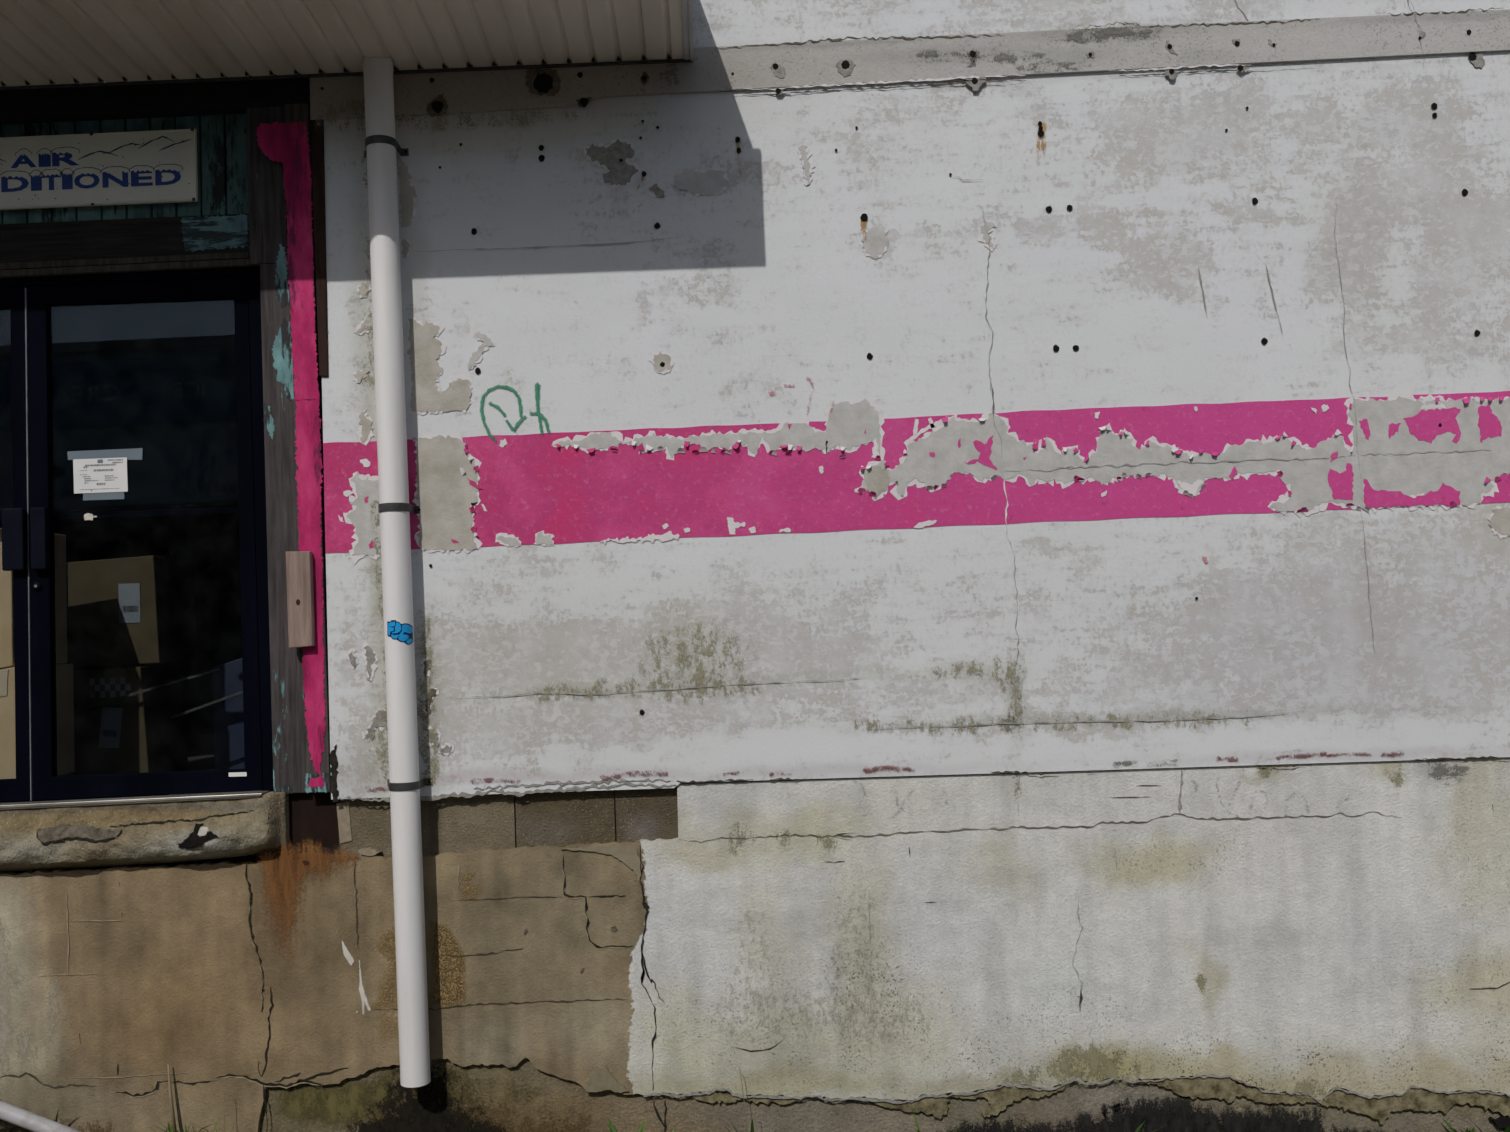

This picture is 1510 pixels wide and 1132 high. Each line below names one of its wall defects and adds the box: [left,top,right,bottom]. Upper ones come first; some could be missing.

peeling [405,315,495,416]
peeling [649,351,674,375]
peeling [338,409,381,564]
peeling [411,432,554,554]
peeling [552,393,1510,539]
crack [681,773,1402,842]
crack [1,806,347,1132]
corrosion [259,841,359,953]
crack [352,861,360,950]
crack [374,849,667,1132]
crack [1072,895,1083,1011]
water stain [348,1060,592,1132]